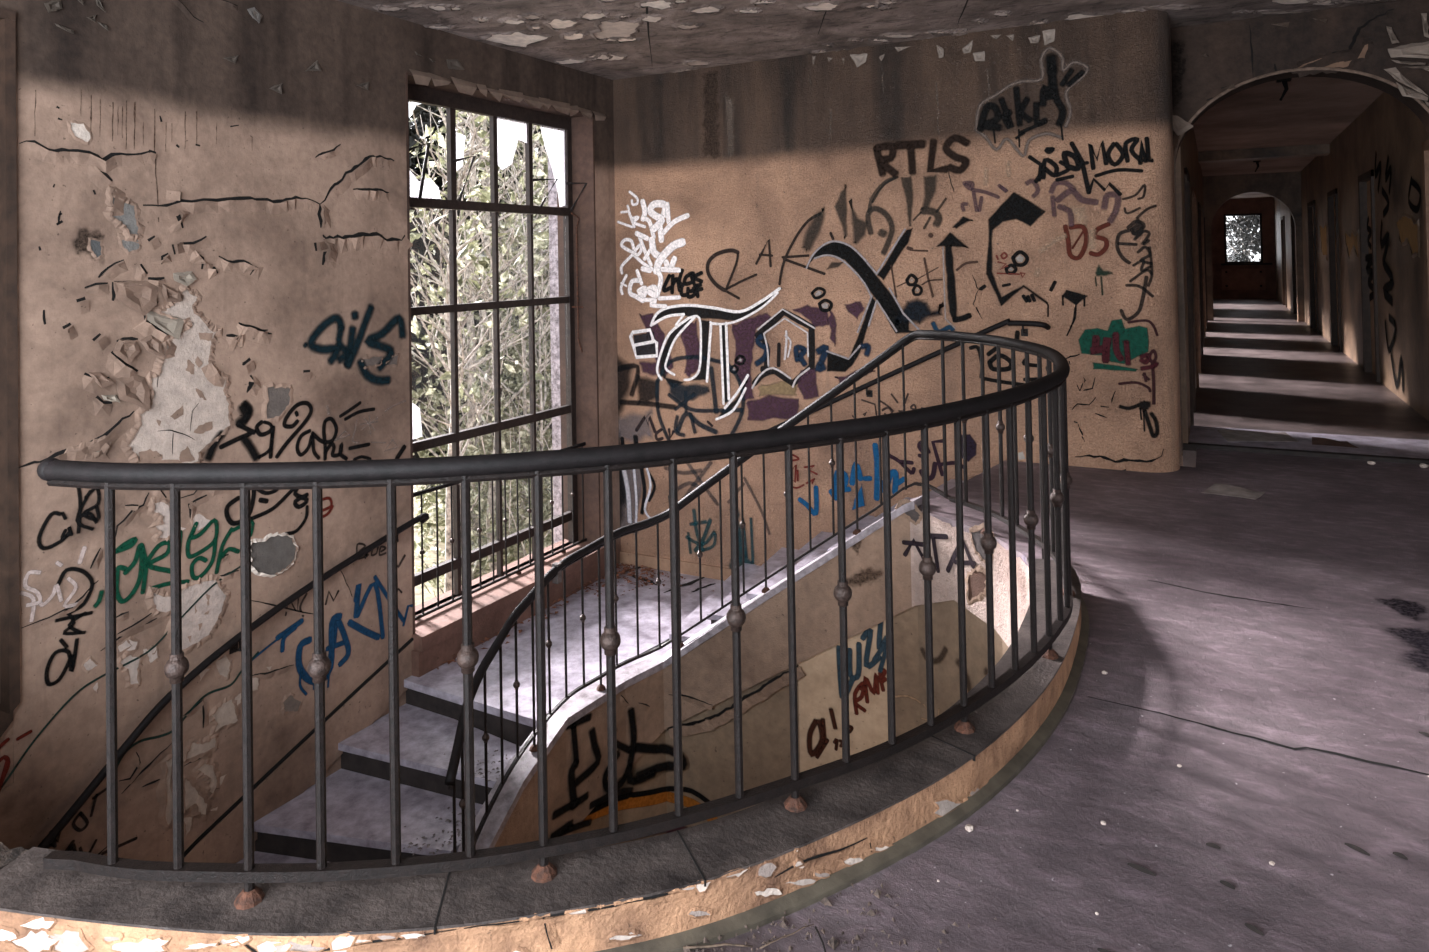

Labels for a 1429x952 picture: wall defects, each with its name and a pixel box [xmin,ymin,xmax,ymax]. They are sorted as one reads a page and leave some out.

peeling [798,0,843,12]
peeling [370,0,777,65]
peeling [671,60,712,73]
crack [19,106,413,481]
flaking render [64,271,235,463]
flaking render [251,532,299,578]
flaking render [933,780,989,818]
flaking render [668,842,893,919]
flaking render [520,897,643,923]
flaking render [0,916,427,952]
flaking render [607,929,644,943]